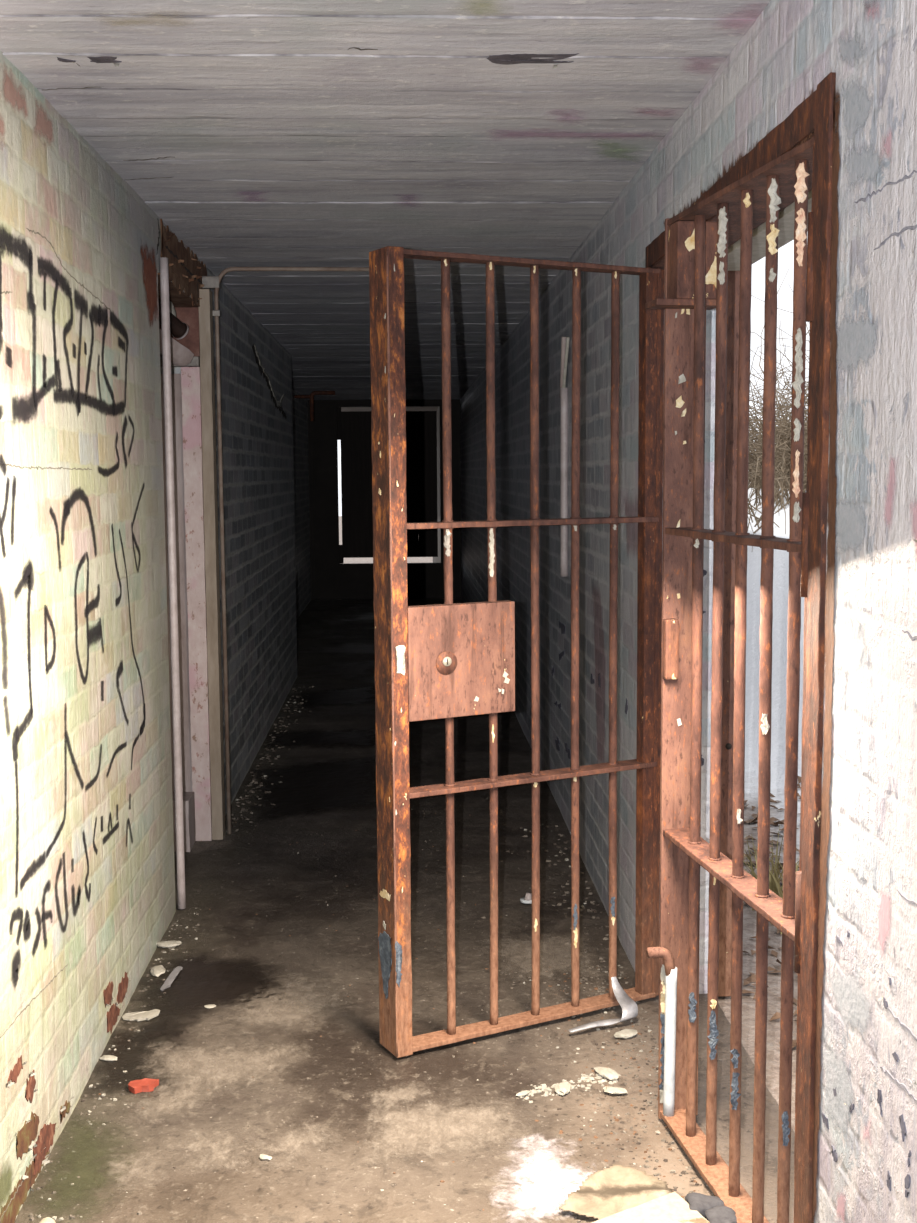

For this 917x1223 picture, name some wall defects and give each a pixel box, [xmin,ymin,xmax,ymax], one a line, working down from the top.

spalling [486,53,579,68]
peeling [685,228,695,251]
peeling [705,206,728,287]
peeling [766,162,810,282]
rust [812,91,840,1223]
peeling [103,972,132,1034]
damp [90,955,280,1092]
peeling [0,1055,74,1223]